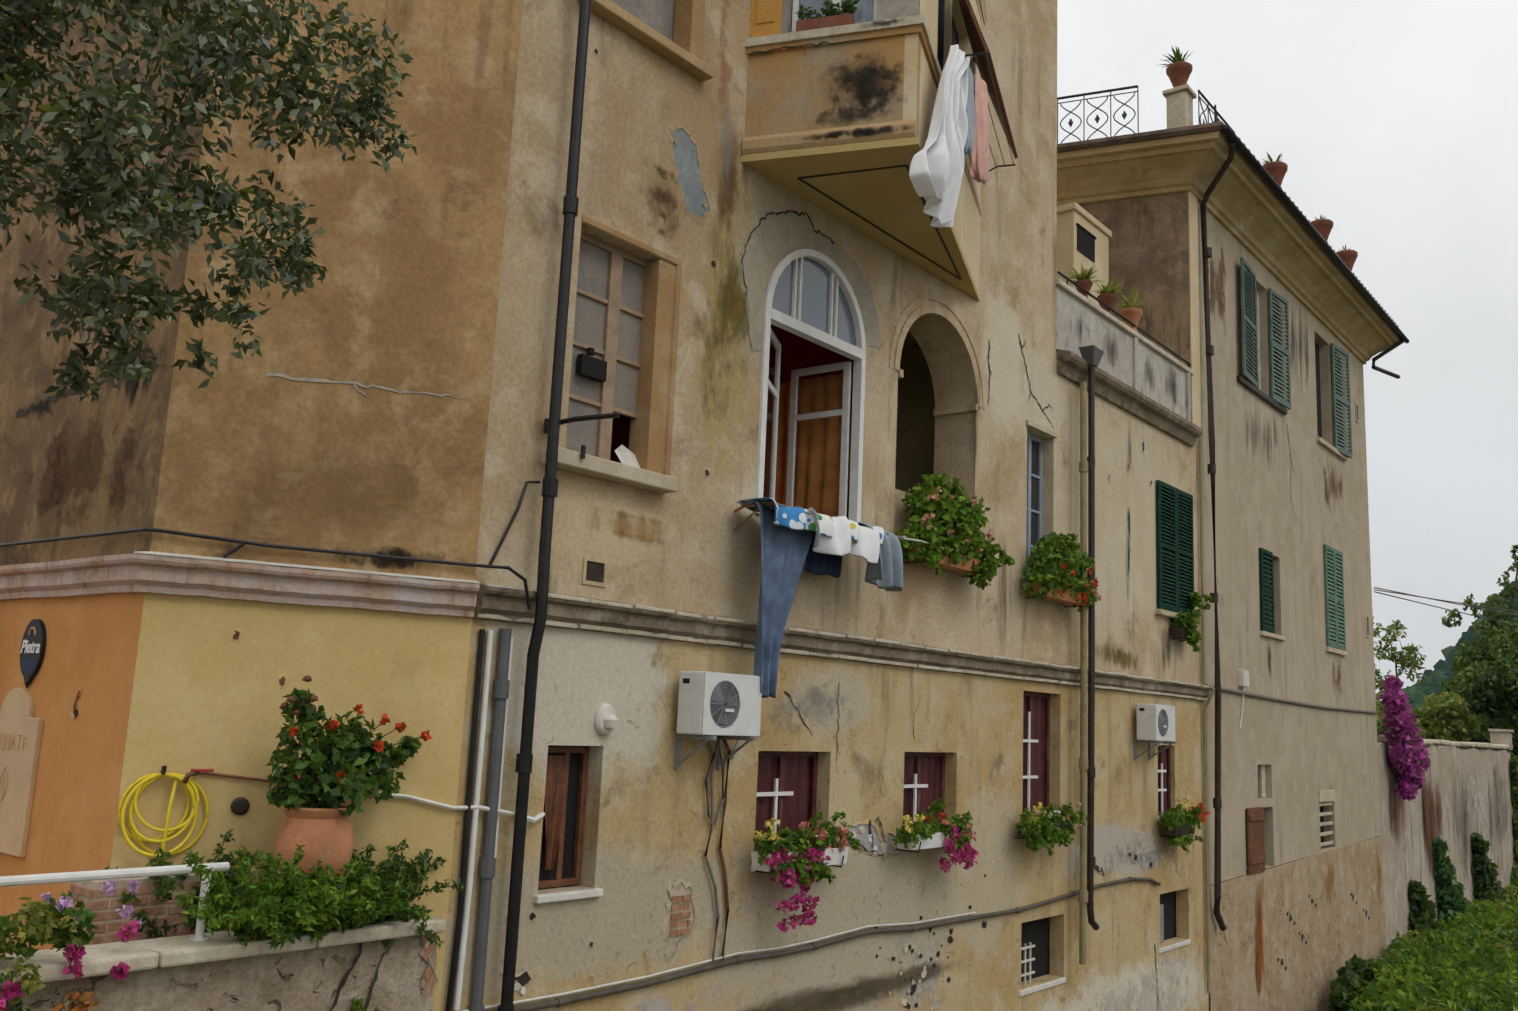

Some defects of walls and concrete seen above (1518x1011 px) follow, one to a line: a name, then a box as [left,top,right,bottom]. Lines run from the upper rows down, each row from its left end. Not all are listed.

damp [817,56,897,138]
flaking render [668,122,712,226]
crack [741,209,834,351]
crack [266,372,479,403]
damp [27,424,133,520]
flaking render [661,877,696,964]
corrosion [1255,889,1263,992]